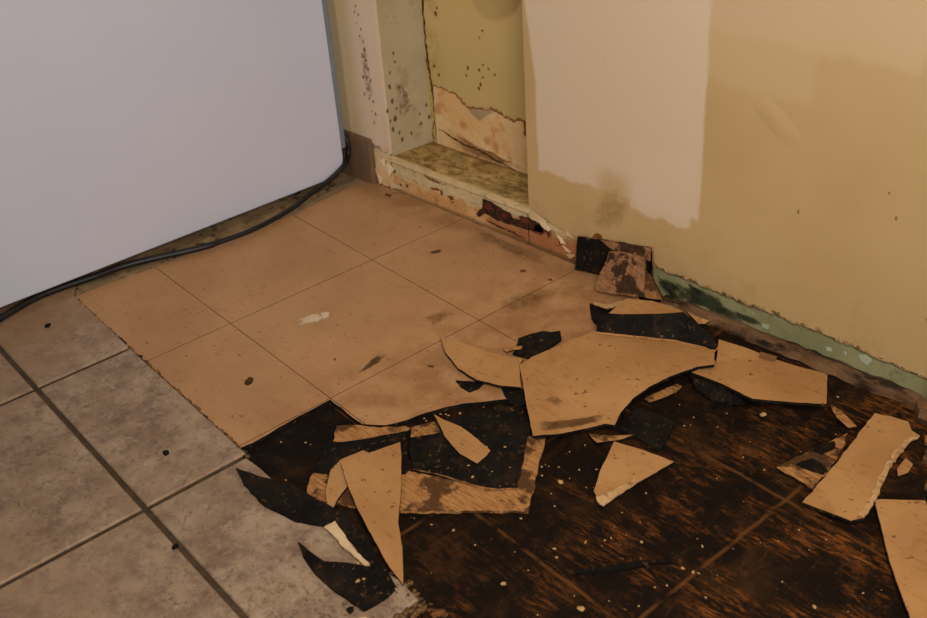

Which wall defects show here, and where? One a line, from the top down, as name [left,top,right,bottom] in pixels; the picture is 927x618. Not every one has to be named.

damp [359,28,430,142]
spalling [433,85,528,175]
peeling [375,157,408,192]
spalling [476,199,575,258]
damp [660,280,758,324]
spalling [324,521,370,566]
spalling [389,572,427,618]